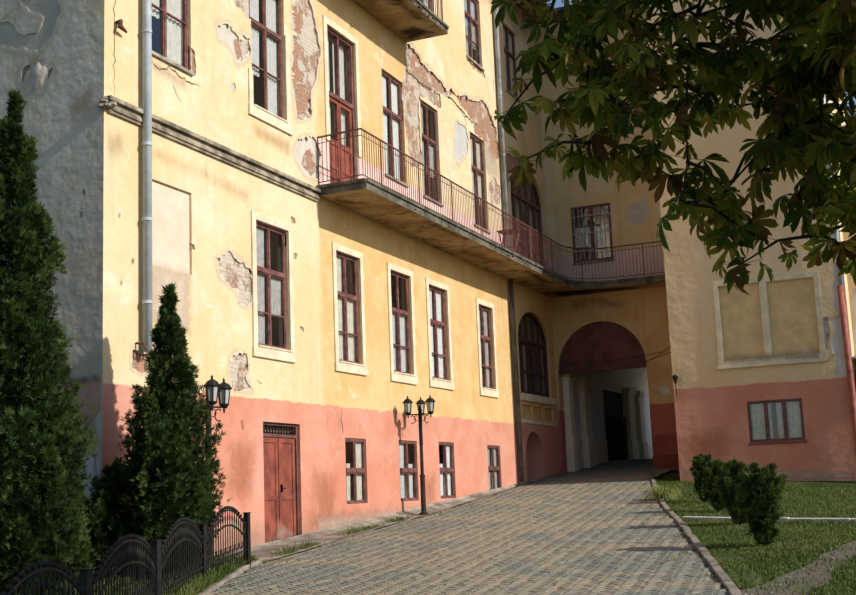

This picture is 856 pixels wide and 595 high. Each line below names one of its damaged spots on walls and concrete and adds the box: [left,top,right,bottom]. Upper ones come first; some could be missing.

peeling [233,0,249,19]
peeling [0,0,64,112]
peeling [216,20,251,66]
peeling [291,0,322,122]
peeling [397,42,523,209]
peeling [293,134,322,180]
peeling [215,249,252,308]
peeling [823,262,856,377]
flaking render [130,347,150,376]
peeling [228,349,253,393]